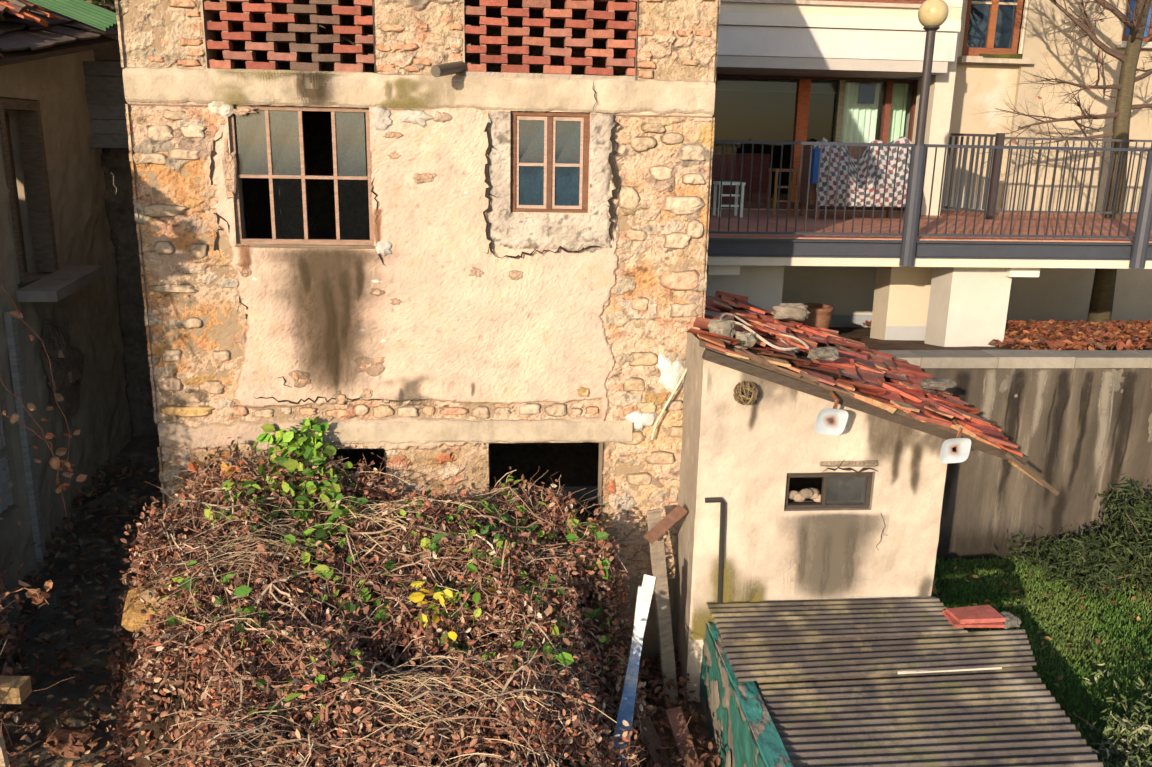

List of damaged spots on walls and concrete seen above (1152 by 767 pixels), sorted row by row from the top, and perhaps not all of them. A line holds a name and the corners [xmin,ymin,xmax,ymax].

spalling [374,0,463,75]
spalling [636,0,720,82]
water stain [286,249,369,386]
spalling [125,104,715,579]
water stain [936,370,1137,561]